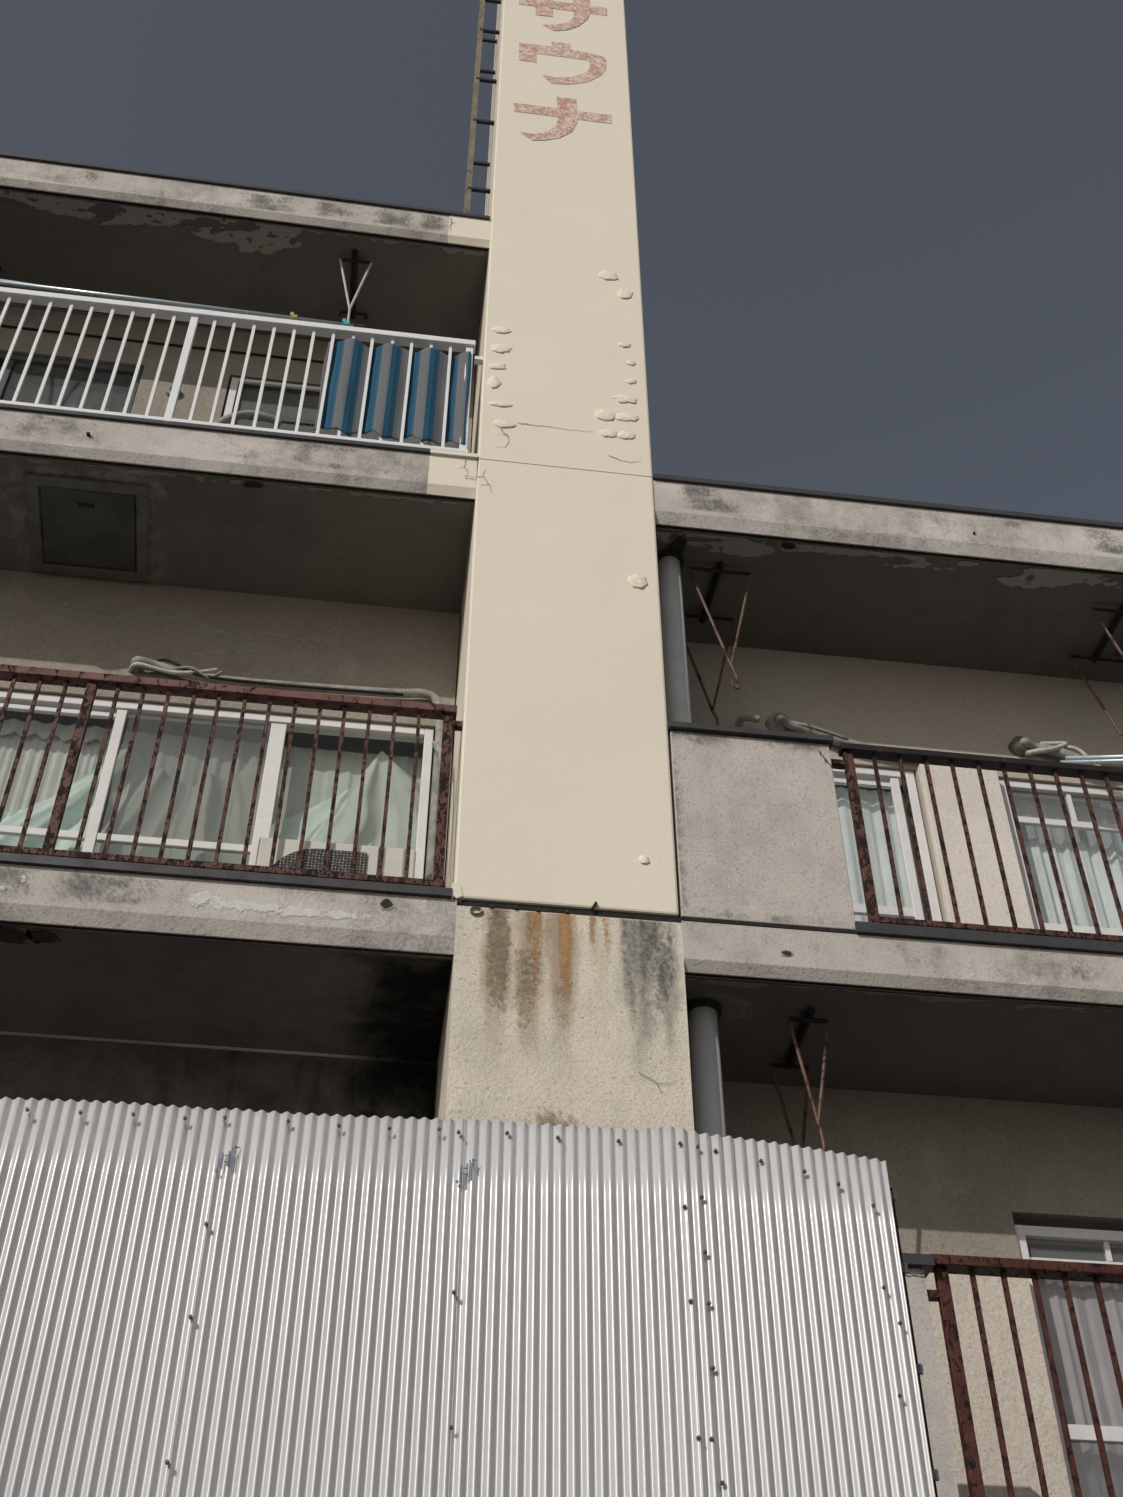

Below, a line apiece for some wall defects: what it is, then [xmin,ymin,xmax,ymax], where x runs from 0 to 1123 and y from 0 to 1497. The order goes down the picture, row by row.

peeling [0,190,301,255]
damp [685,486,730,512]
peeling [656,531,979,571]
damp [1093,531,1123,553]
peeling [995,568,1123,589]
corrosion [527,912,572,998]